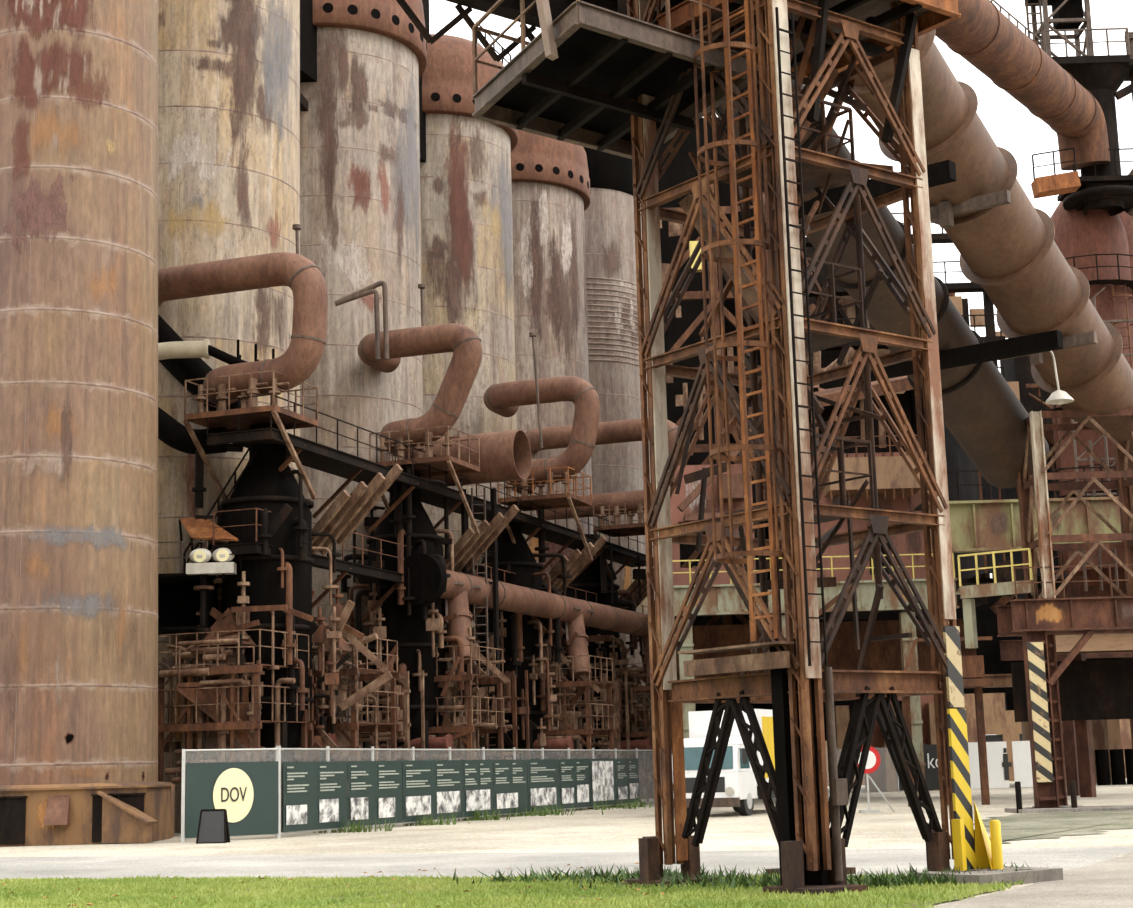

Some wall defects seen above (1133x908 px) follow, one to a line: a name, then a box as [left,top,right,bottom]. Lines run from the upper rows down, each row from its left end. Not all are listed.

rust [13,117,77,176]
rust [55,407,72,477]
rust [1036,603,1062,623]